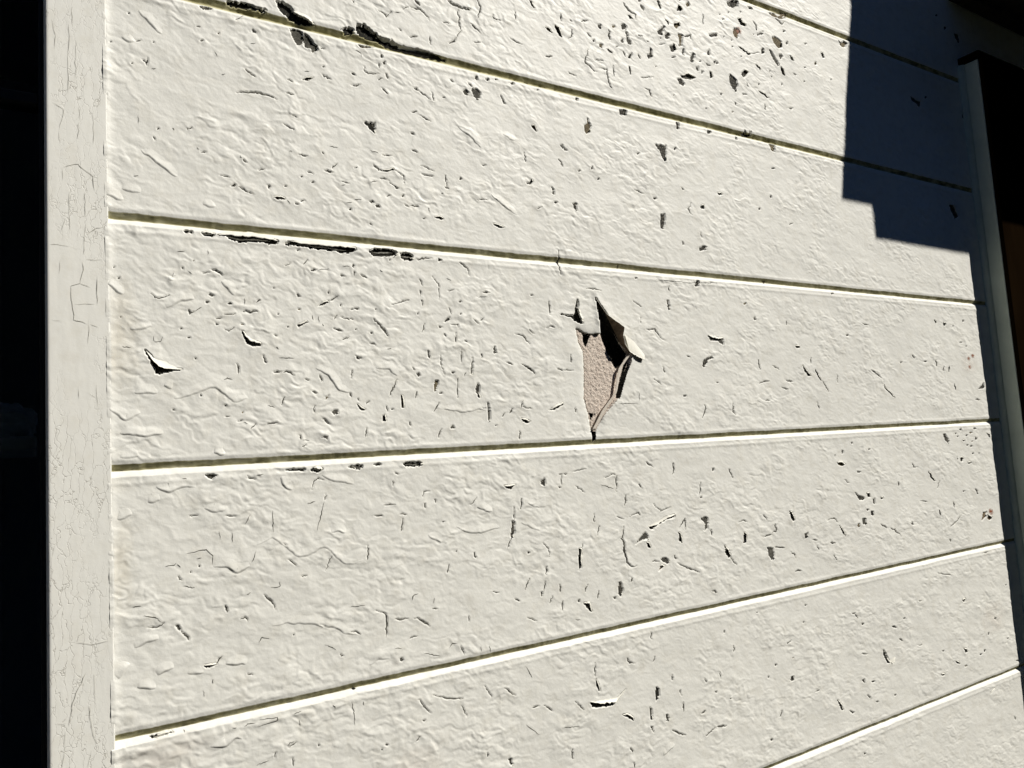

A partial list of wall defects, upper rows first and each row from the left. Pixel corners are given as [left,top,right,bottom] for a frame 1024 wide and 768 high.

spalling [227,2,317,53]
spalling [342,25,445,62]
peeling [657,3,718,86]
peeling [727,0,751,38]
crack [52,9,94,142]
peeling [720,68,748,95]
crack [56,164,104,338]
spalling [184,230,356,254]
spalling [369,249,414,261]
peeling [145,349,183,374]
peeling [565,299,645,431]
crack [56,641,106,766]